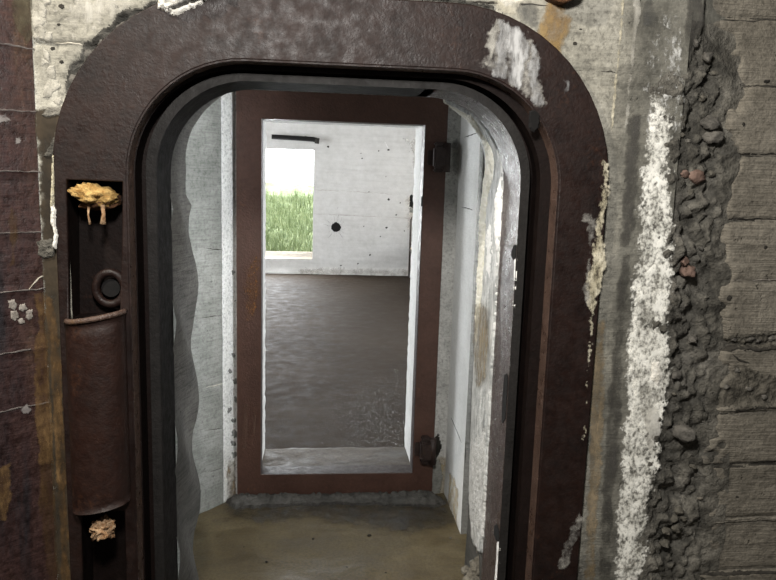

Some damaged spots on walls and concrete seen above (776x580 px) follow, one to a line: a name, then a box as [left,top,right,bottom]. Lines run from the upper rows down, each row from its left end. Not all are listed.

flaking render [31,0,158,117]
leakage [158,0,206,16]
rust [539,3,570,52]
leakage [443,99,504,553]
leakage [586,163,610,334]
leakage [603,94,680,580]
spalling [637,20,776,580]
spalling [461,550,480,580]